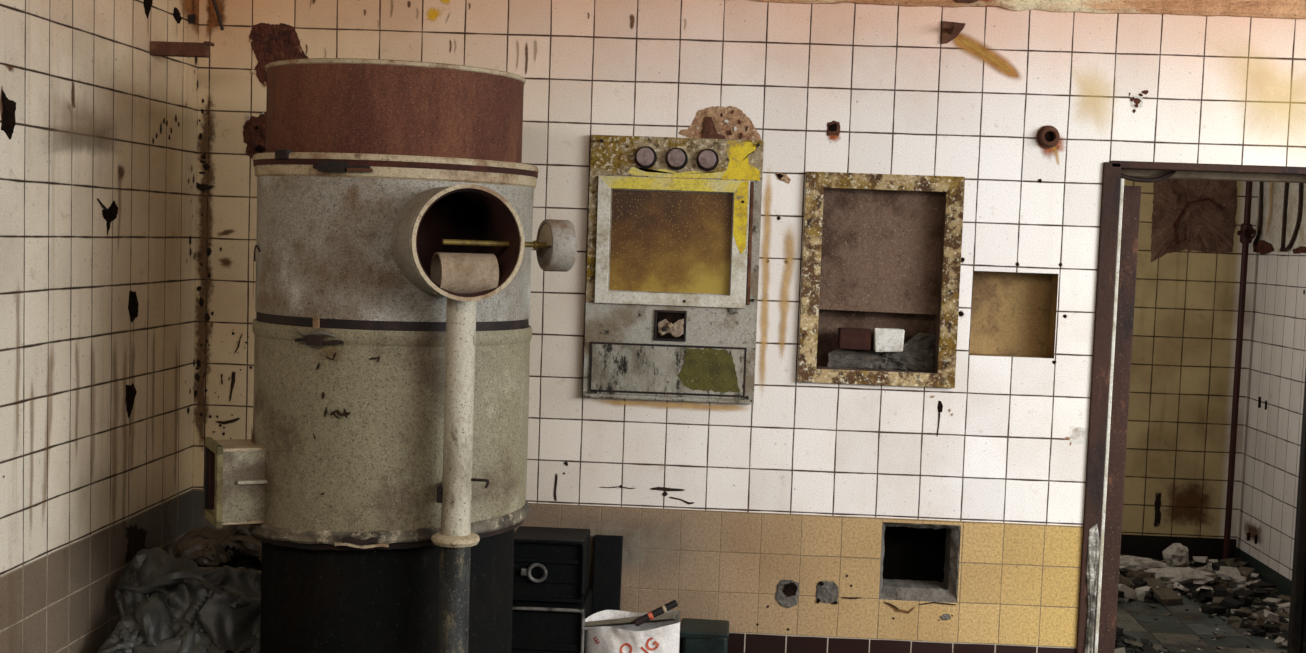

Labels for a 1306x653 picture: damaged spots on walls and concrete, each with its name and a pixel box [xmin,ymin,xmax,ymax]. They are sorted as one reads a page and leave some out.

flaking render [249,23,308,87]
flaking render [243,112,266,160]
flaking render [679,106,761,140]
corrosion [1042,139,1062,164]
spalling [97,198,118,235]
spalling [775,579,800,608]
spalling [816,581,839,604]